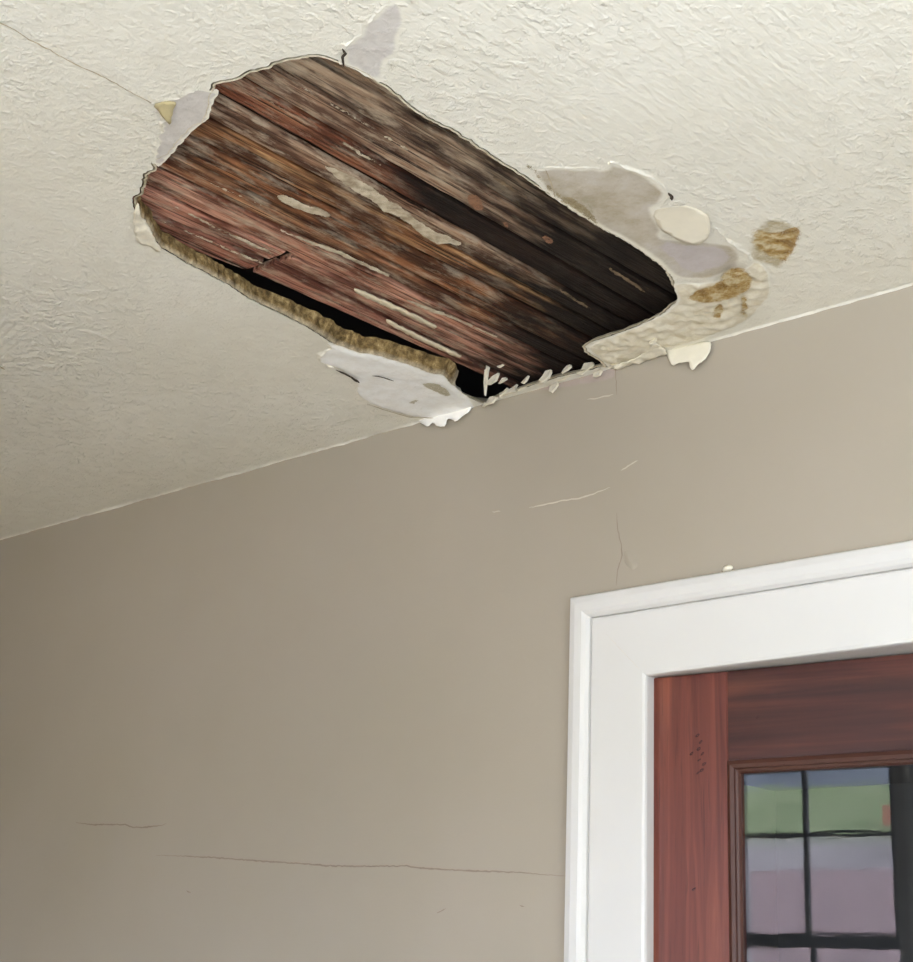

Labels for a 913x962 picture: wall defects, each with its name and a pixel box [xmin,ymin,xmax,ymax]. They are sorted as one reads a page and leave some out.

crack [0,22,151,103]
peeling [133,0,754,427]
crack [157,855,564,876]